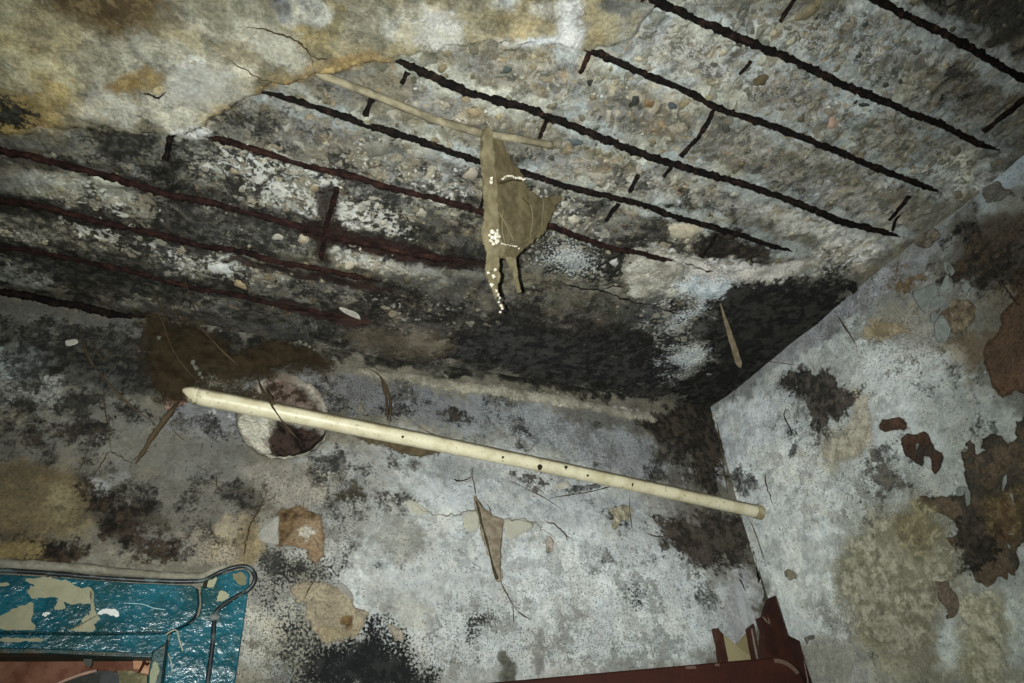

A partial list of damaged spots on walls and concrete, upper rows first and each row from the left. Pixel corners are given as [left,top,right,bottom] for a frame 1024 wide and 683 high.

crack [246,27,328,65]
rust [223,185,486,293]
spalling [0,0,1024,343]
rust [277,298,372,327]
damp [372,226,859,496]
peeling [983,279,1024,398]
damp [0,375,192,578]
peeling [258,506,369,643]
damp [250,531,447,683]
peeling [407,500,566,554]
peeling [901,431,944,474]
peeling [917,416,1024,619]